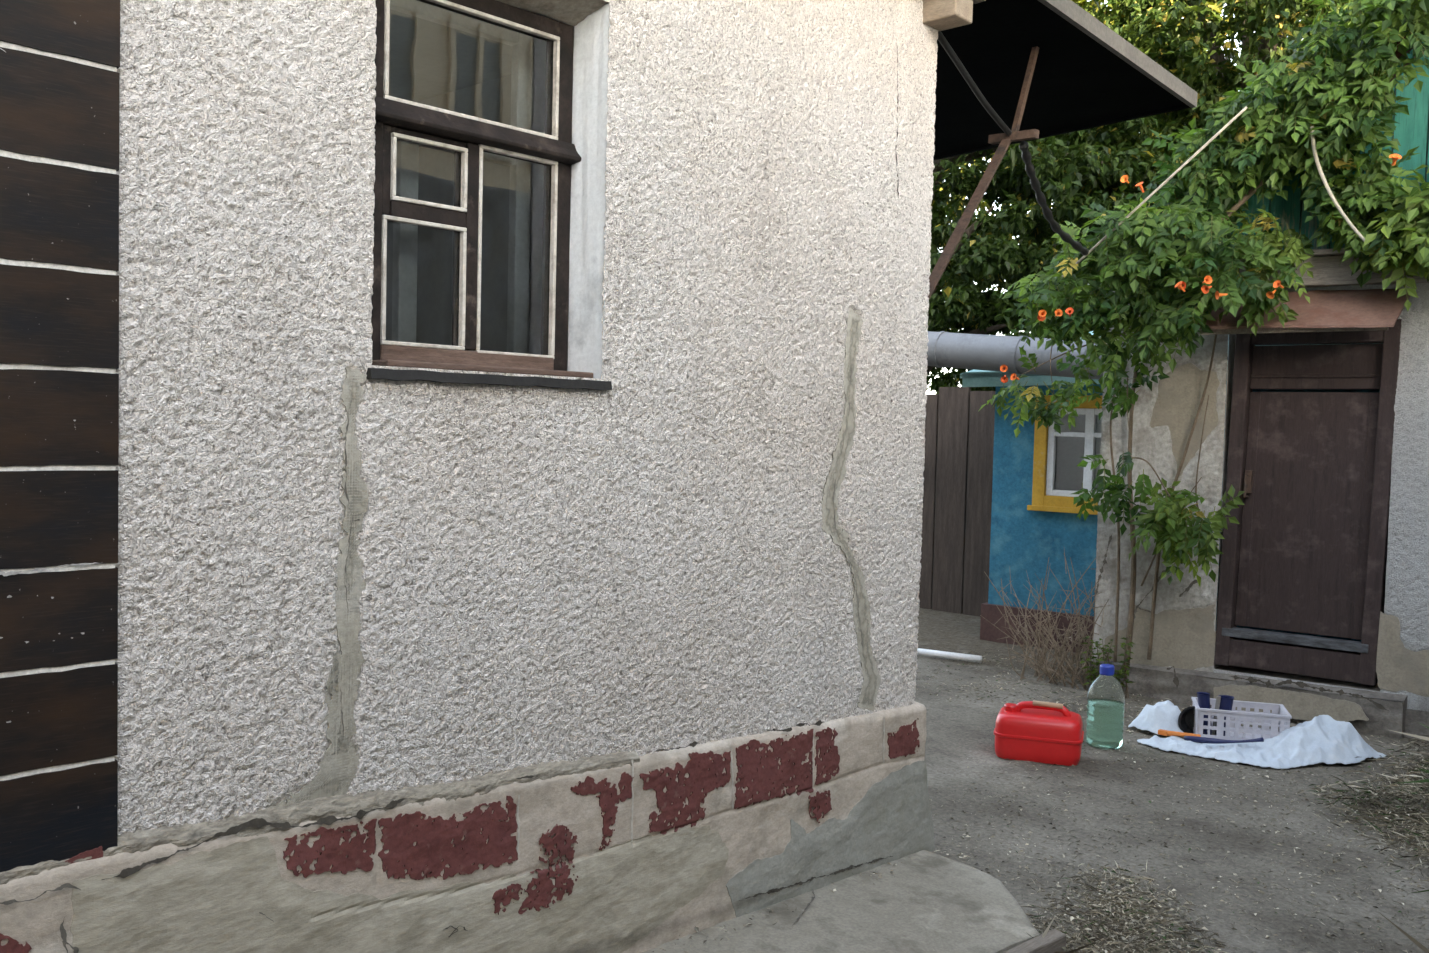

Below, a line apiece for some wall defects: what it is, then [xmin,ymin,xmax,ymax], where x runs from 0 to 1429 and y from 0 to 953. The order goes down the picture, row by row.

crack [344,381,360,619]
peeling [887,718,920,759]
peeling [571,727,840,851]
peeling [65,846,103,864]
peeling [283,796,518,880]
peeling [492,824,578,915]
peeling [0,933,32,953]